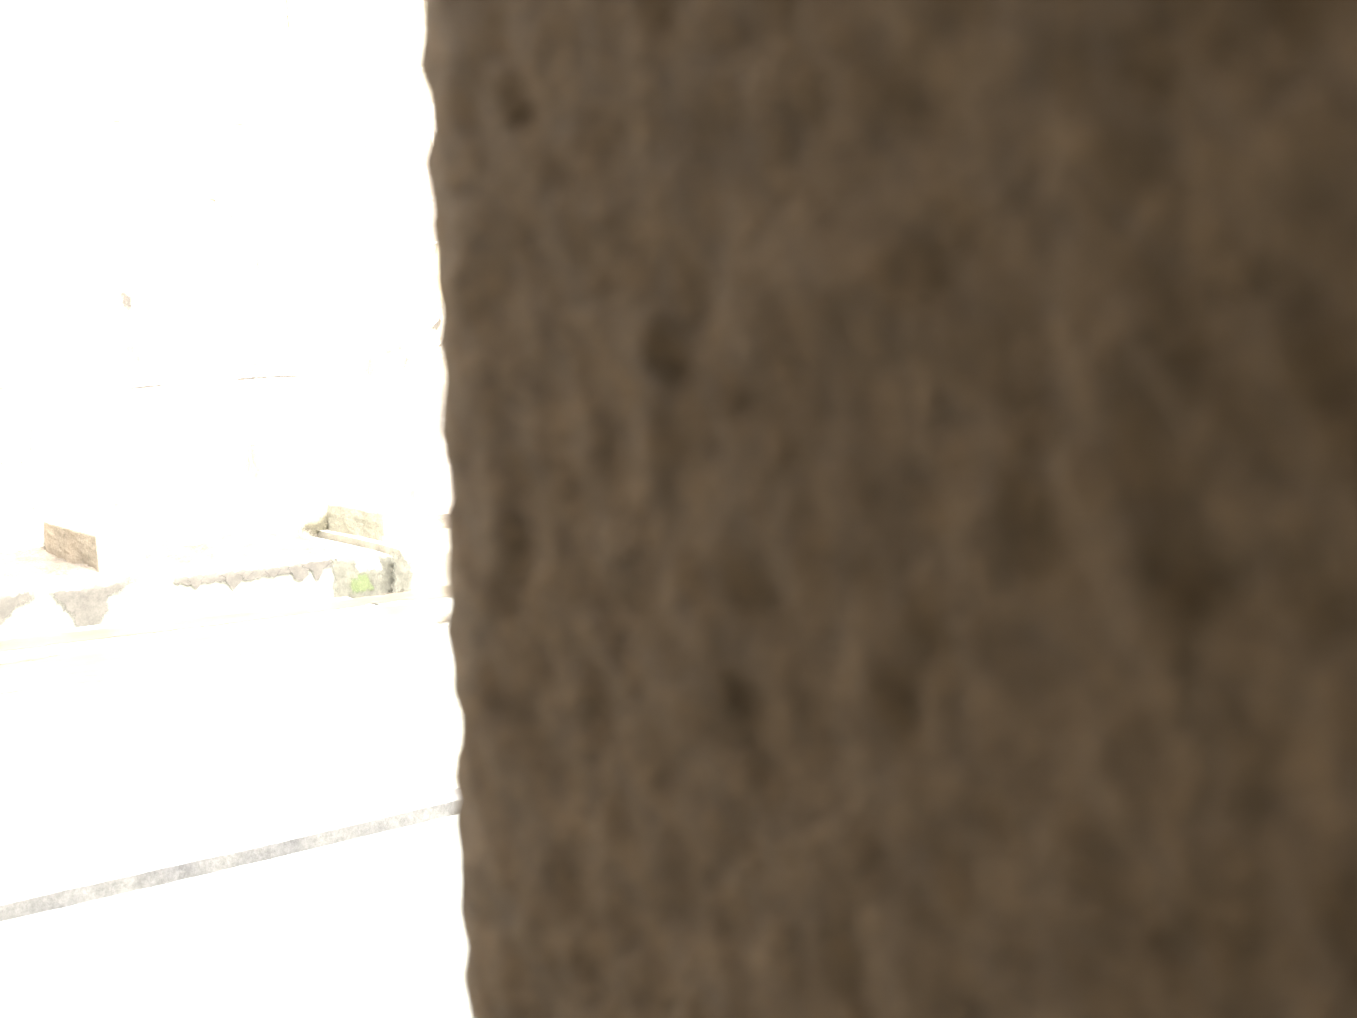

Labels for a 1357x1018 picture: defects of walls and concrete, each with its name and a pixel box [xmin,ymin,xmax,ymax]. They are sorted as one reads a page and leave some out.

damp [0,551,447,651]